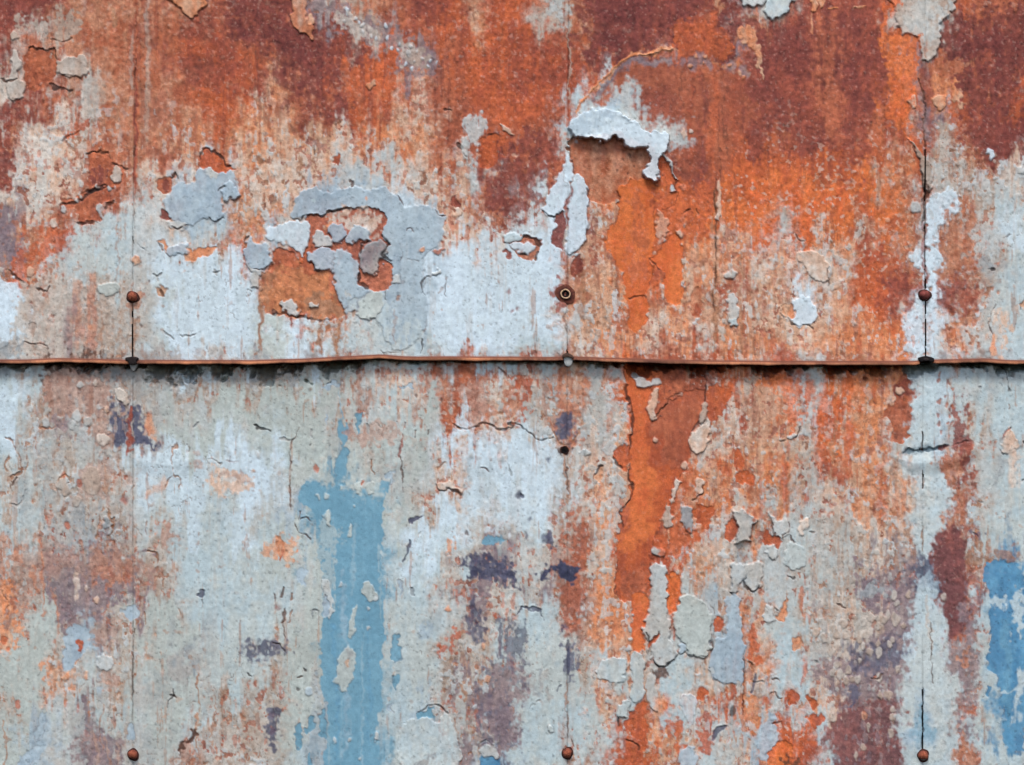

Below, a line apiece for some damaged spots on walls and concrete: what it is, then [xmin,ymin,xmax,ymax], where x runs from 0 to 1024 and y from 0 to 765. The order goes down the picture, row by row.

corrosion [568,0,924,208]
peeling [894,0,977,111]
corrosion [939,0,1024,168]
peeling [155,147,242,262]
peeling [243,185,521,430]
corrosion [484,125,563,260]
peeling [540,75,715,334]
corrosion [874,208,1000,329]
crack [507,422,545,441]
crack [919,442,948,452]
peeling [594,362,918,765]
corrosion [927,371,981,765]